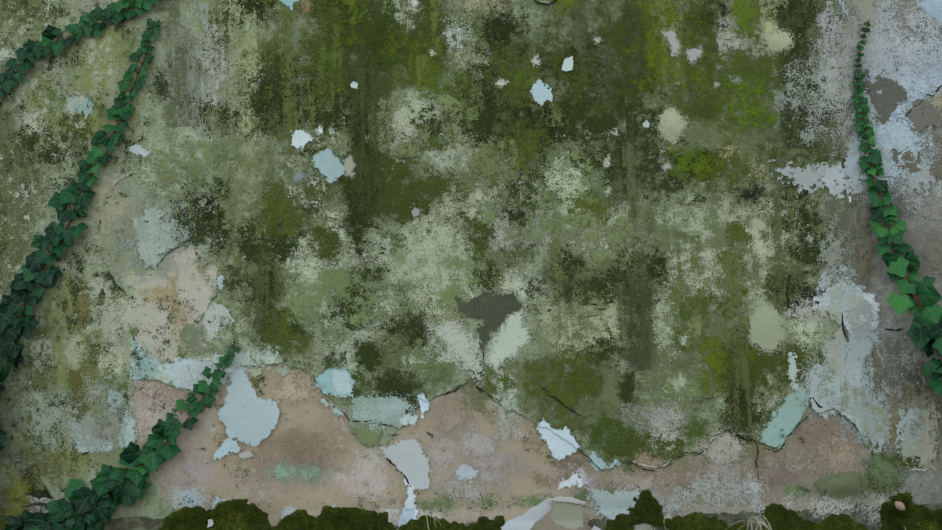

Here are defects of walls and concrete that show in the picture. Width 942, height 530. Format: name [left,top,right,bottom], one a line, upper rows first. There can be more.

flaking render [530,79,553,106]
damp [525,63,563,131]
flaking render [291,130,314,150]
flaking render [312,148,345,183]
damp [881,155,942,302]
peeling [126,244,220,363]
crack [541,387,586,419]
peeling [131,363,869,527]
crack [580,393,865,490]